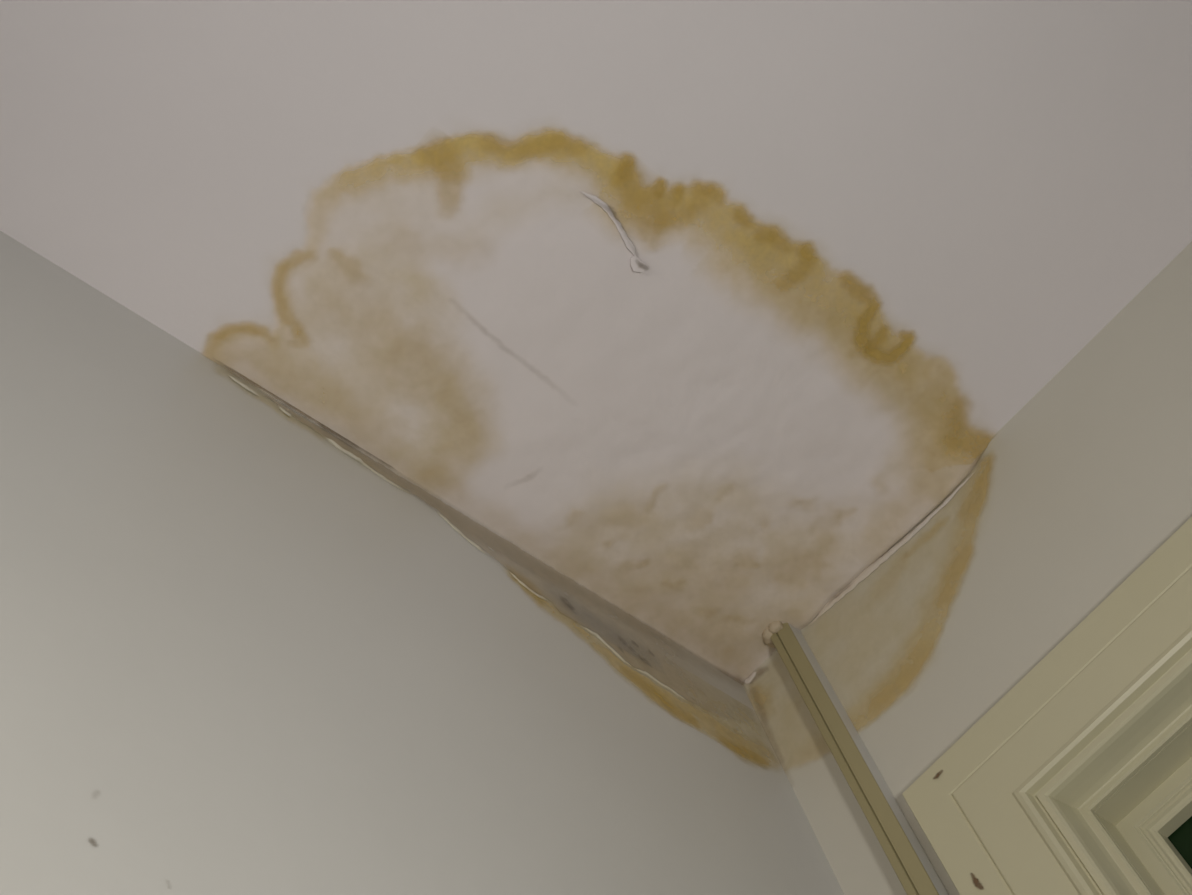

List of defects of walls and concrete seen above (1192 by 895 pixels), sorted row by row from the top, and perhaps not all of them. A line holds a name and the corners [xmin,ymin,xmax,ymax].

damp [345,132,913,361]